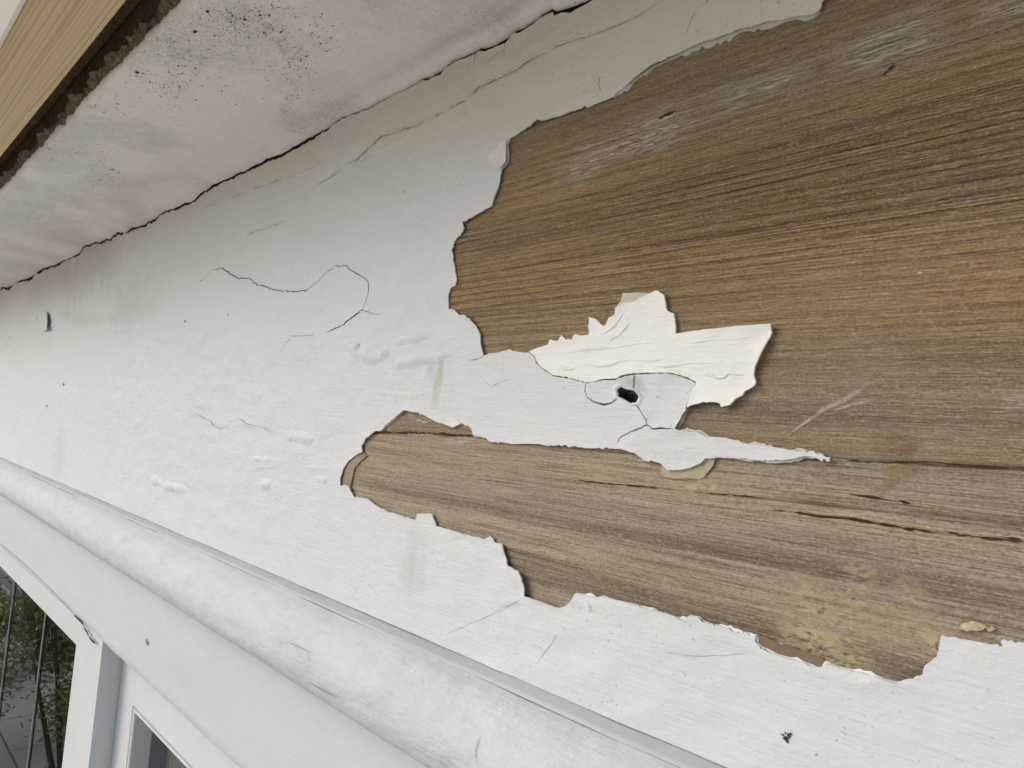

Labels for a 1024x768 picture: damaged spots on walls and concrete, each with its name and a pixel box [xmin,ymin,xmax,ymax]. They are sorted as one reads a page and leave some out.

water stain [92,0,352,118]
crack [0,0,592,291]
crack [201,265,379,346]
peeling [341,0,1024,683]
crack [584,377,673,441]